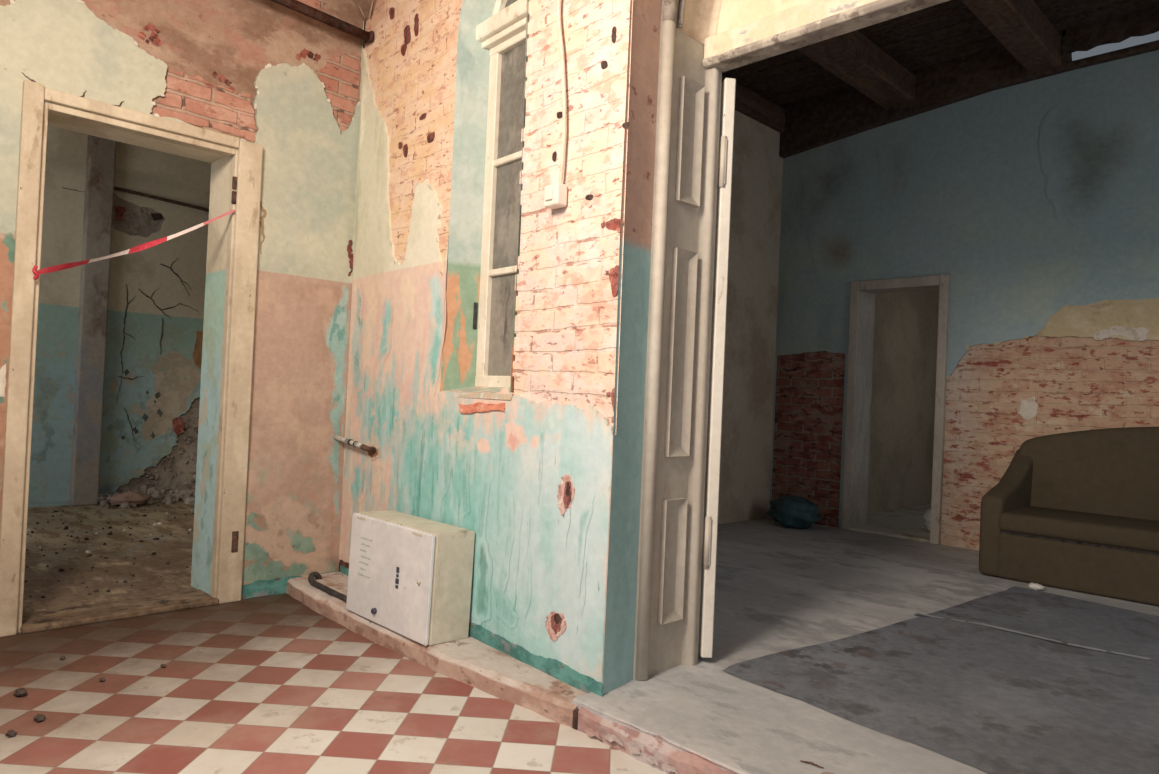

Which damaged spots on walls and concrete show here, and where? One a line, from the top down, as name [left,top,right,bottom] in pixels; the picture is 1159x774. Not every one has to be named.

damp [1038,98,1155,229]
peeling [0,353,9,412]
peeling [0,230,15,325]
crack [117,259,198,443]
spalling [71,0,633,682]
spalling [772,351,845,528]
spalling [940,298,1159,550]